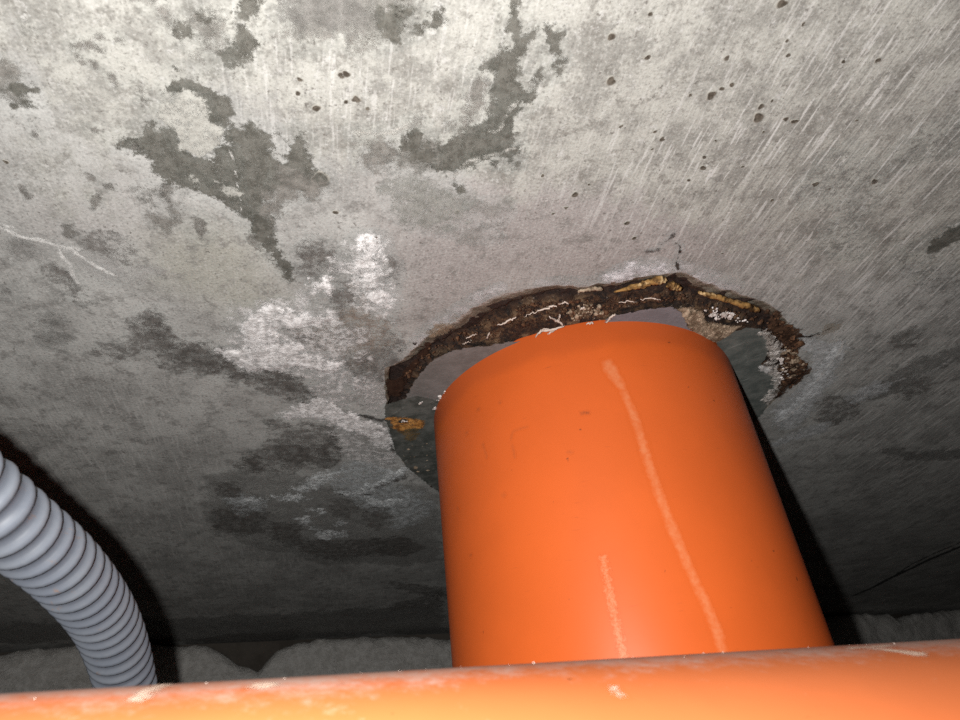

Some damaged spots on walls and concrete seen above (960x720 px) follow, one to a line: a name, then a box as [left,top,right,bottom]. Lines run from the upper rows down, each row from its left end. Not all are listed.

water stain [533,255,747,291]
water stain [87,228,507,567]
rust [385,417,425,441]
rust [764,309,812,399]